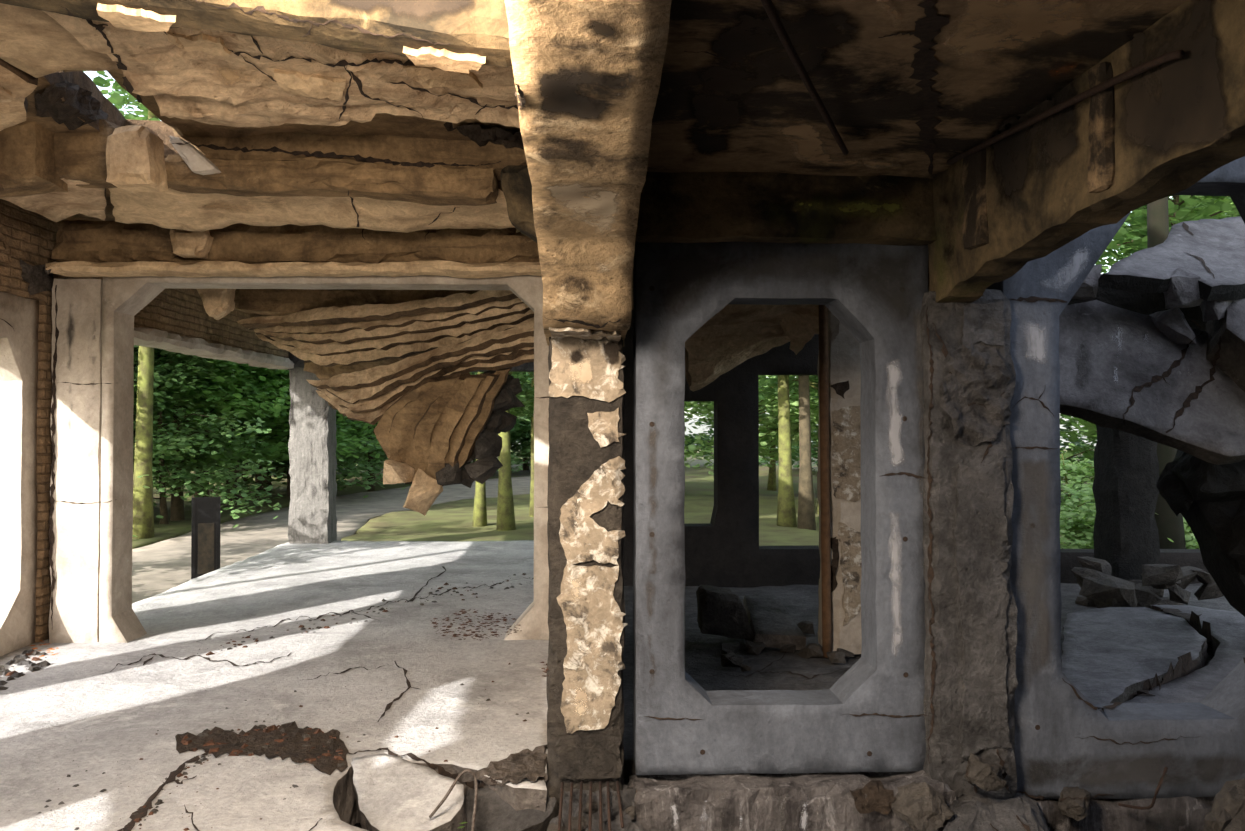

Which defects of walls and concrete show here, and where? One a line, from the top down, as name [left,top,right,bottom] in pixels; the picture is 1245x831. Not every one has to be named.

crack [63,7,142,103]
crack [195,0,519,121]
damp [537,65,635,120]
damp [588,20,618,39]
damp [686,7,860,156]
crack [878,0,949,175]
damp [1121,0,1232,155]
flaking render [830,380,861,502]
flaking render [549,327,628,734]
flaking render [830,522,862,626]
crack [1062,605,1212,745]
crack [117,750,209,831]